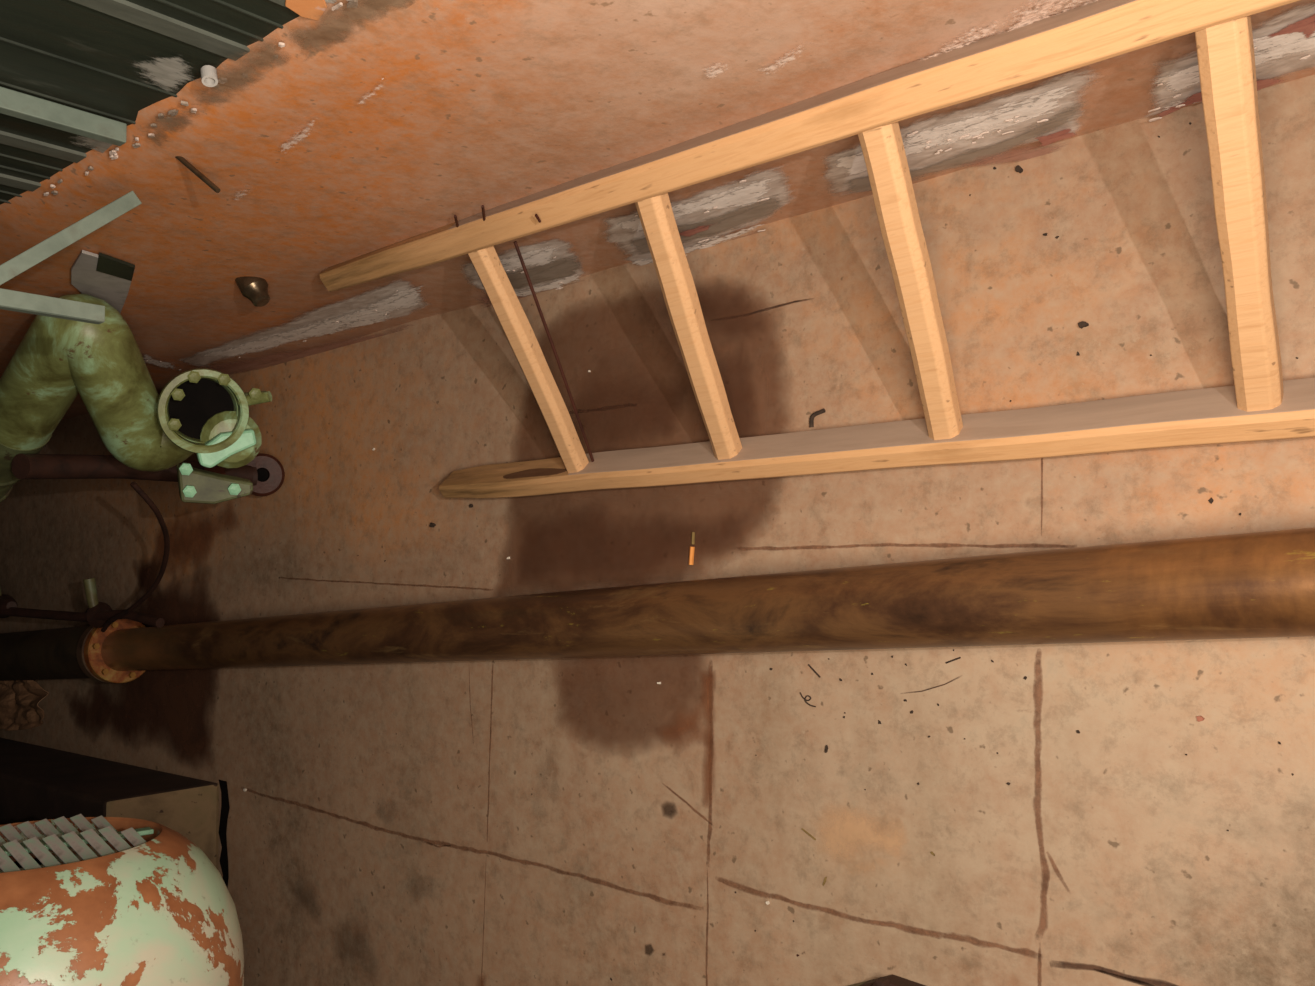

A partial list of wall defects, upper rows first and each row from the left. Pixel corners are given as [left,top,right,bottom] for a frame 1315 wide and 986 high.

spalling [74,0,412,160]
water stain [924,0,1098,60]
water stain [281,120,314,151]
peeling [144,281,426,374]
water stain [519,393,560,462]
water stain [541,298,710,454]
water stain [698,291,807,438]
water stain [505,478,772,588]
water stain [562,654,697,741]
crack [247,652,1177,986]